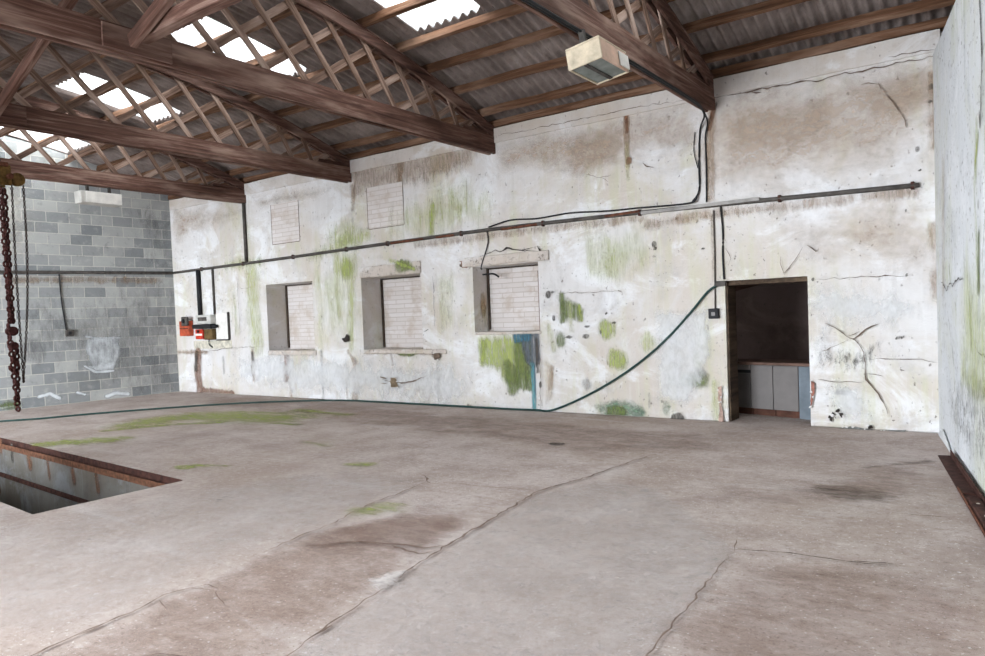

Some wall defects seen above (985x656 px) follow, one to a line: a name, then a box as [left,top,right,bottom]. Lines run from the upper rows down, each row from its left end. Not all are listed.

crack [715,49,933,128]
water stain [546,291,565,322]
water stain [502,334,540,409]
water stain [607,406,644,416]
crack [818,323,937,414]
crack [263,450,668,656]
crack [645,540,891,656]